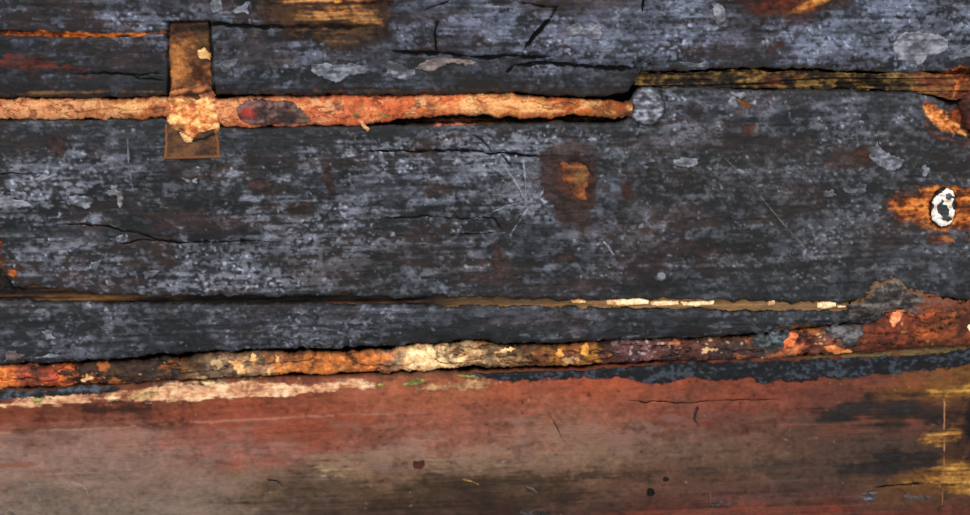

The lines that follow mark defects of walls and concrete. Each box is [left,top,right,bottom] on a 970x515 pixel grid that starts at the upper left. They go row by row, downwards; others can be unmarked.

corrosion [933,67,970,97]
corrosion [0,95,173,120]
corrosion [213,92,633,128]
corrosion [923,102,970,146]
corrosion [553,152,595,202]
corrosion [888,185,970,243]
corrosion [0,240,17,277]
corrosion [0,276,970,390]